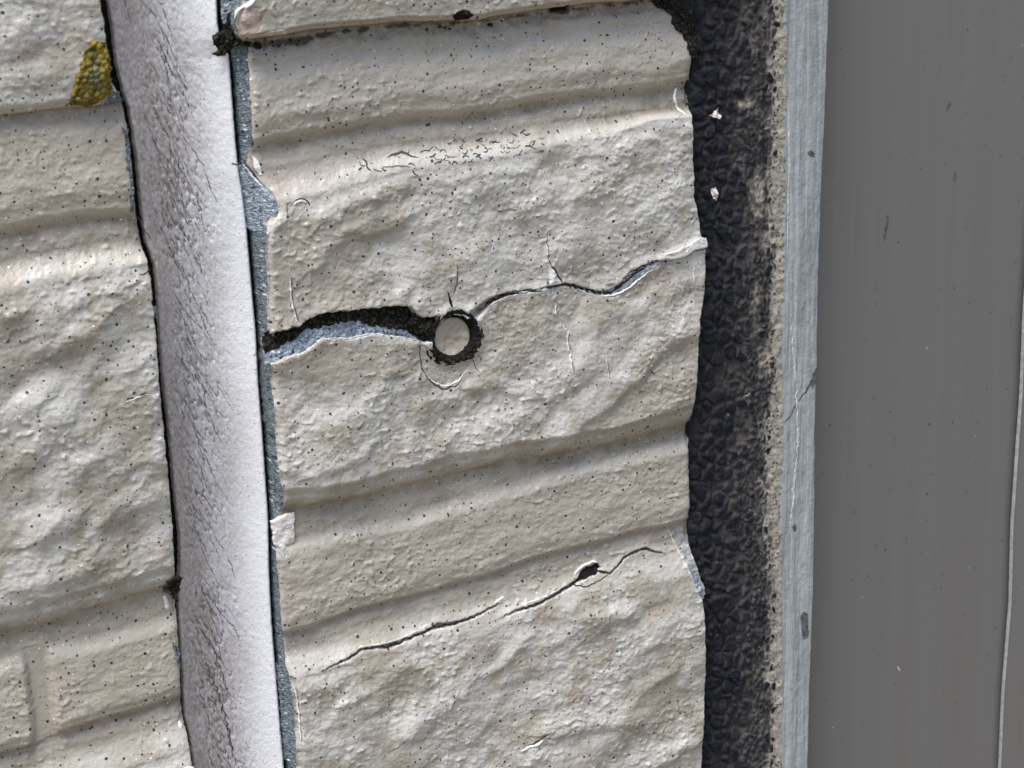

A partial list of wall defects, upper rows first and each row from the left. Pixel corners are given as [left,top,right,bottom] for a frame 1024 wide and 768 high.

crack [358,130,545,176]
crack [247,228,708,768]